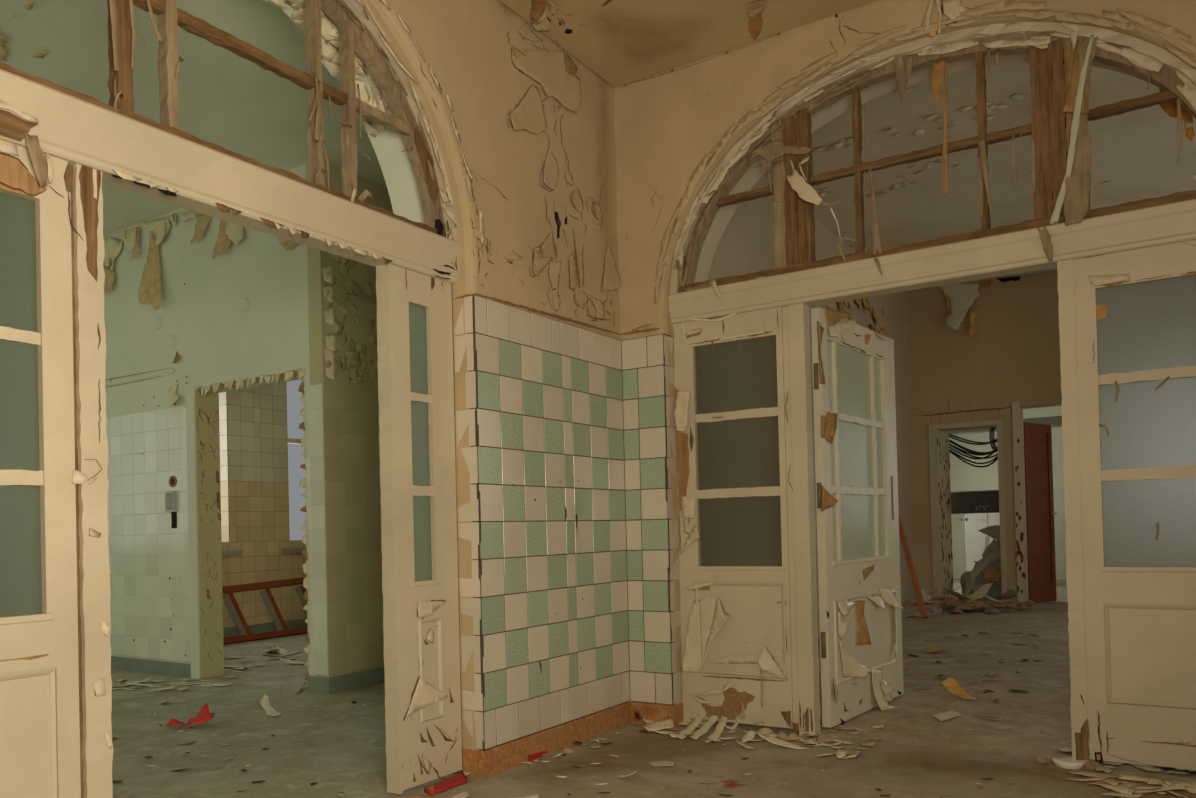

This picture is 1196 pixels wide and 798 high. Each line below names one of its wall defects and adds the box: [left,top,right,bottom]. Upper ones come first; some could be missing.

peeling [109,0,163,113]
peeling [0,100,243,310]
peeling [260,217,309,250]
peeling [309,0,621,322]
peeling [654,0,1196,351]
peeling [322,238,393,392]
peeling [817,298,891,385]
peeling [143,368,310,681]
peeling [821,412,838,444]
peeling [821,485,838,512]
peeling [937,438,953,598]
peeling [402,725,458,791]